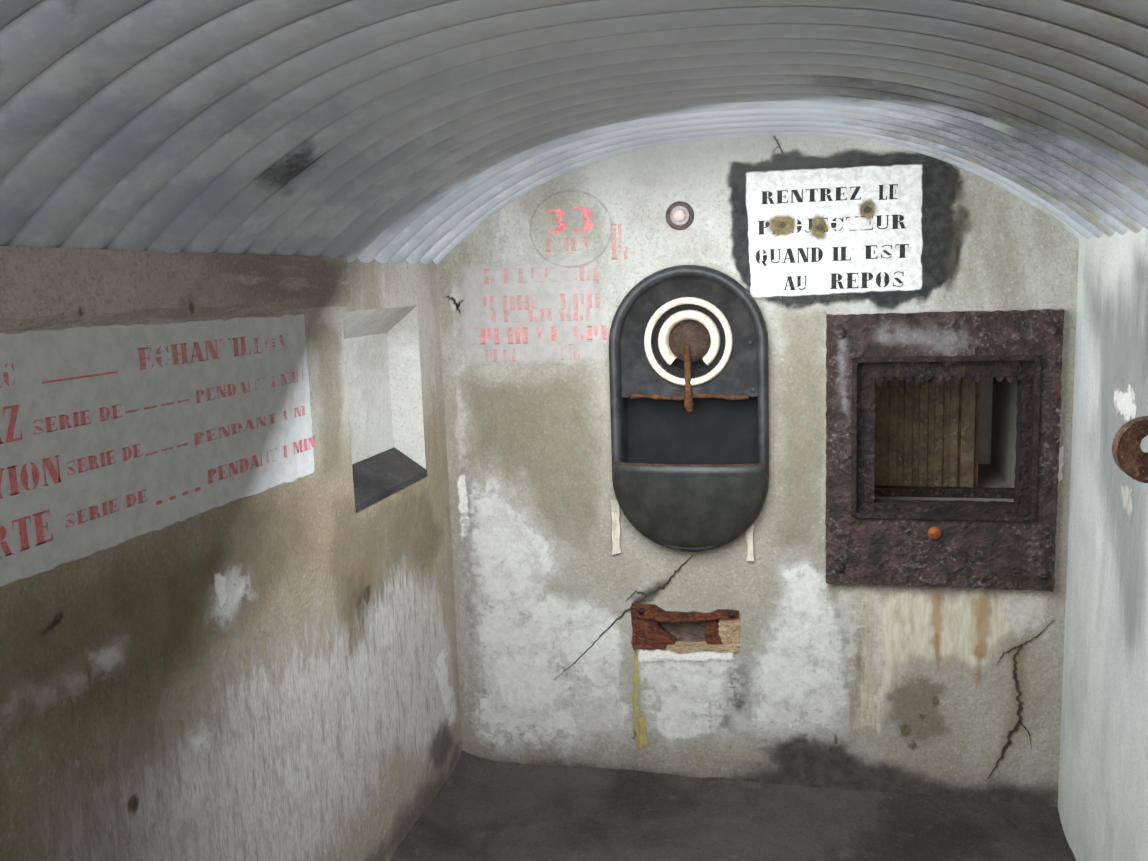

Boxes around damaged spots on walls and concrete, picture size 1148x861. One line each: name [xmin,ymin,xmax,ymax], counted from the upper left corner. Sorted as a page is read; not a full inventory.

damp [902,126,1100,197]
damp [46,478,1054,861]
crack [554,555,693,680]
crack [988,620,1054,779]